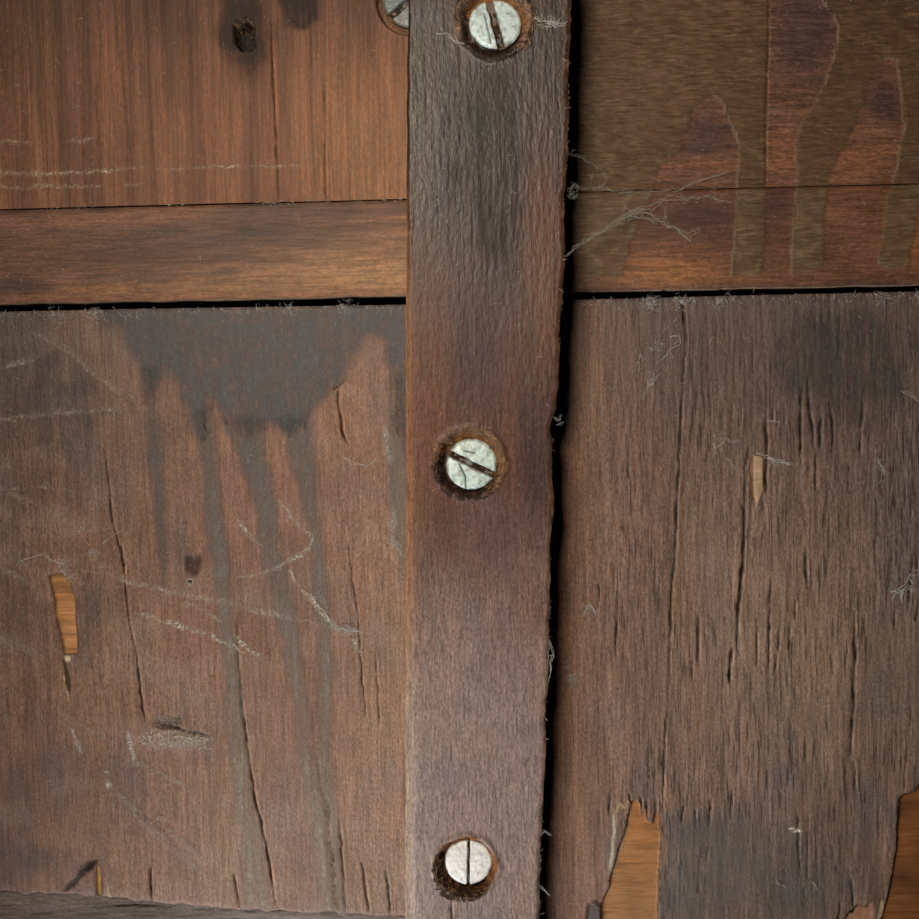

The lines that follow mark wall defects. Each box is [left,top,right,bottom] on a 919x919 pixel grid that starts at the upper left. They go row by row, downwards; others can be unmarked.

crack [108,478,127,602]
water stain [187,557,200,575]
crack [728,409,795,682]
peeling [50,574,78,702]
crack [130,627,145,717]
water stain [199,406,269,906]
water stain [223,417,345,919]
crack [237,632,274,894]
peeling [586,790,663,919]
peeling [845,785,919,919]